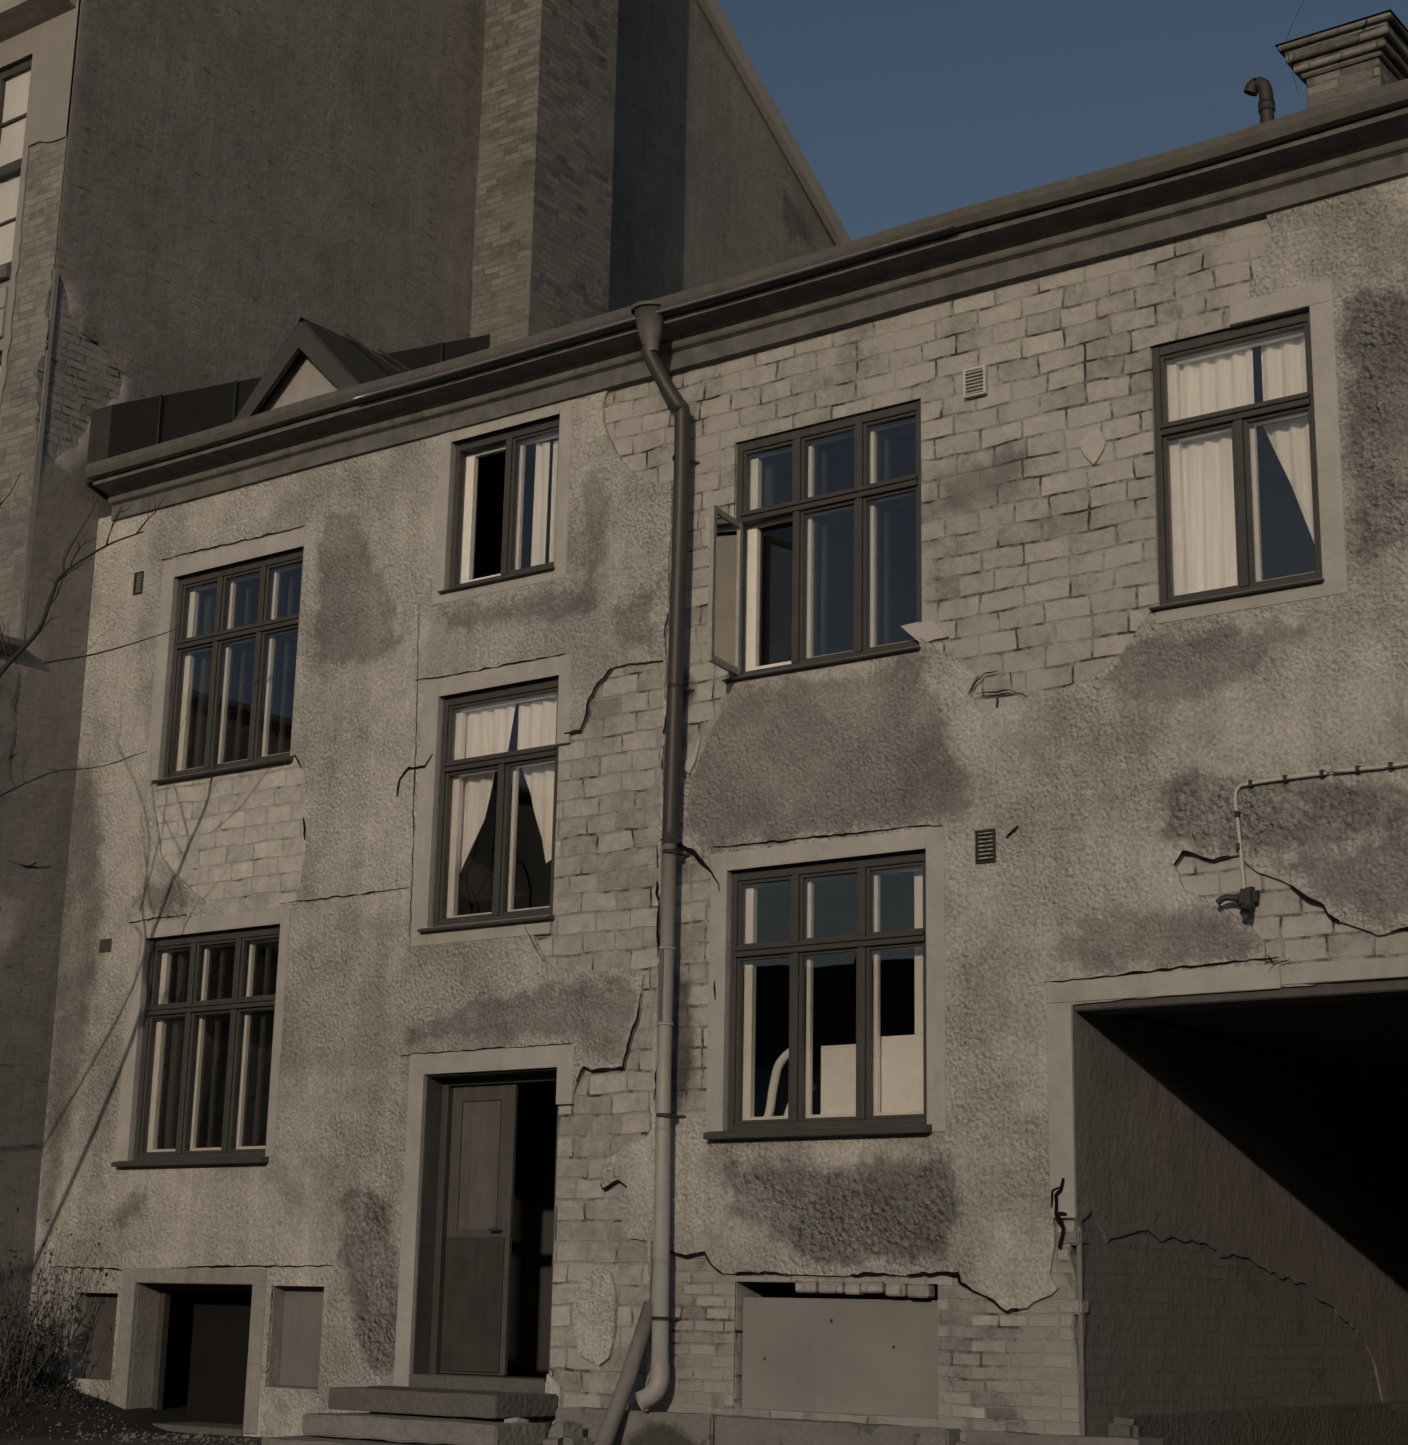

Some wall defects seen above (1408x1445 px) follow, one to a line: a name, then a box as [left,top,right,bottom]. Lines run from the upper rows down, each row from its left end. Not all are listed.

spalling [0,138,123,638]
peeling [462,473,609,629]
spalling [137,754,306,914]
spalling [536,218,1272,1436]
peeling [1163,773,1408,965]